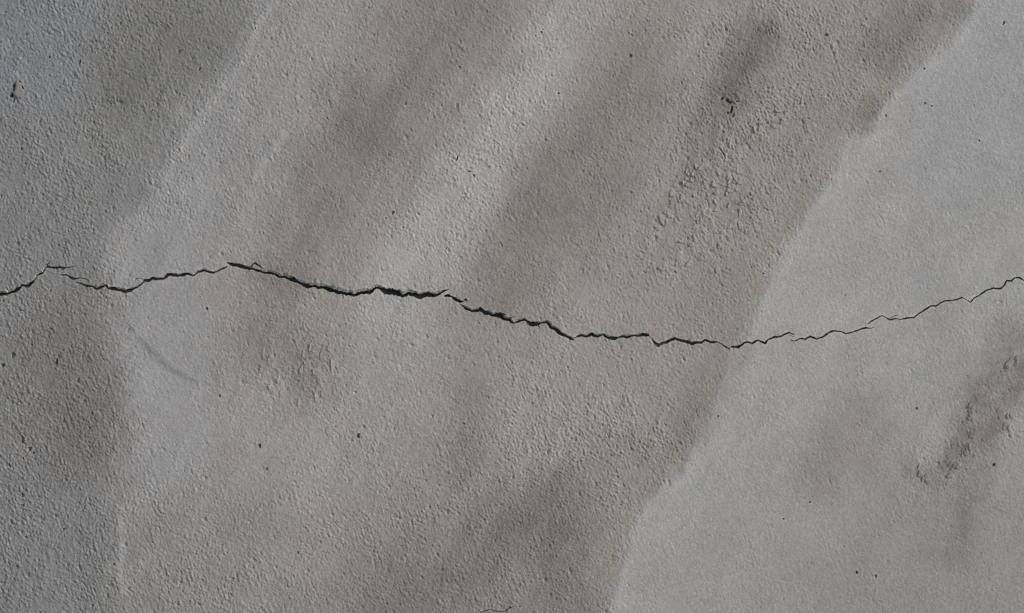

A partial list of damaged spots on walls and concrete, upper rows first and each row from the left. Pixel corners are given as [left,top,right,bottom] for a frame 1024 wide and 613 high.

crack [0,262,1024,350]